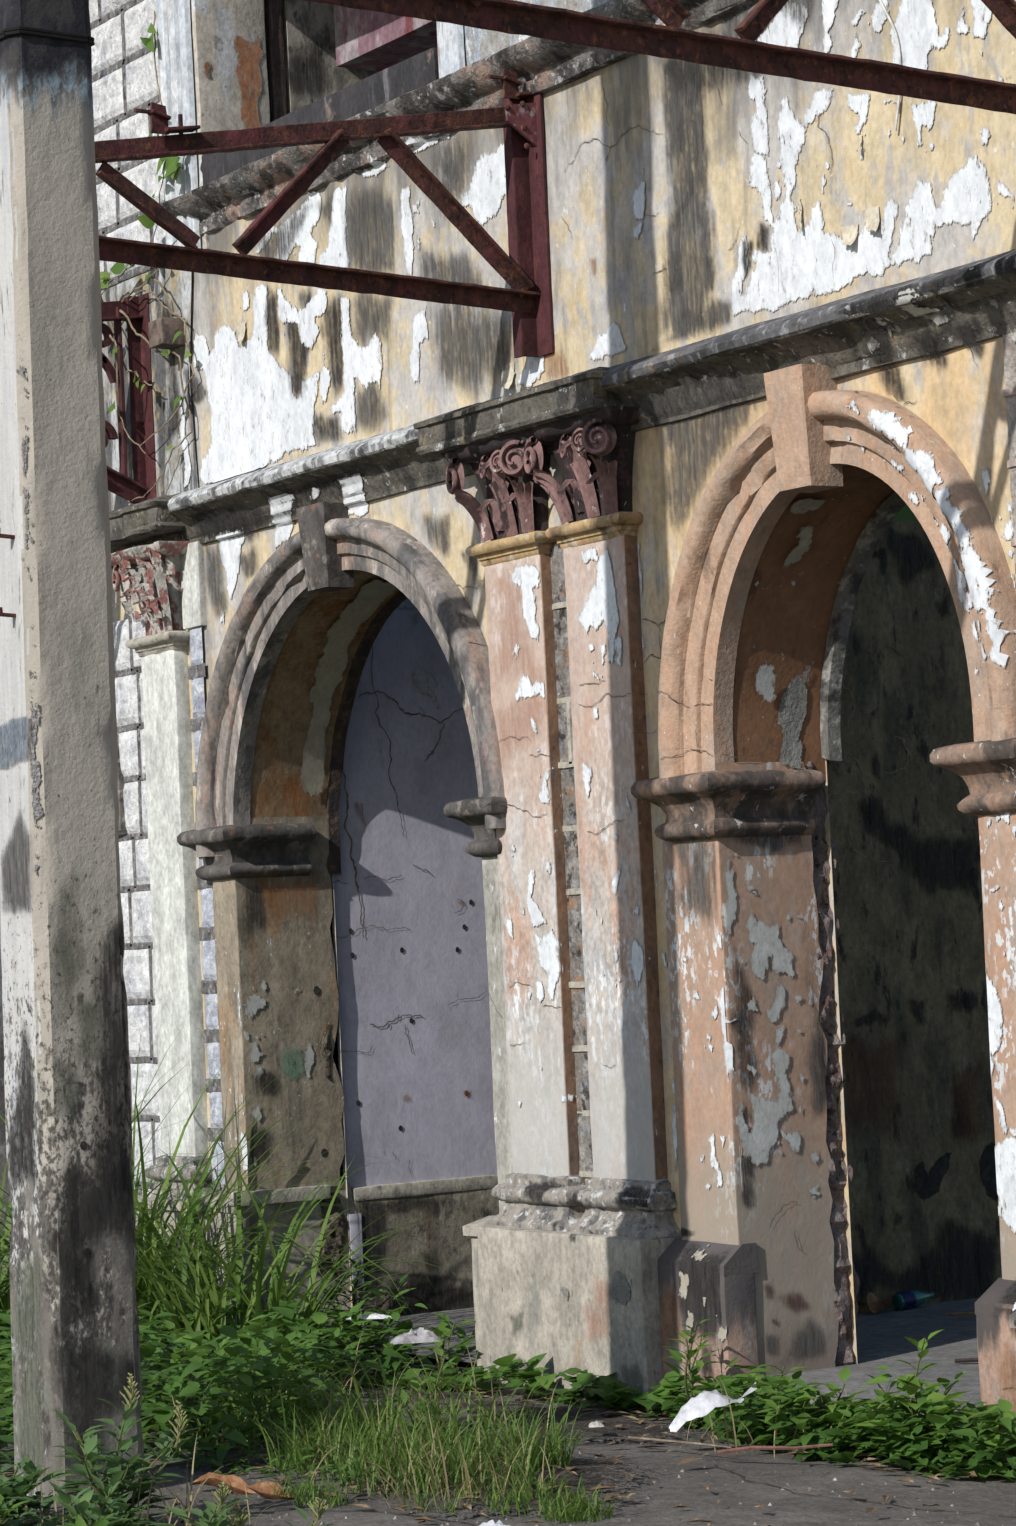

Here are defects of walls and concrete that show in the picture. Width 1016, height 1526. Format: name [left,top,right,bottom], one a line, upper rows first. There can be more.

peeling [757,0,992,70]
peeling [254,155,389,268]
water stain [663,59,756,338]
peeling [730,74,1014,316]
peeling [178,281,383,488]
peeling [846,400,1016,674]
crack [331,647,497,952]
water stain [9,1033,34,1185]
water stain [53,875,134,1321]
peeling [979,1100,1016,1234]
water stain [14,1260,139,1475]
water stain [852,1220,1016,1333]